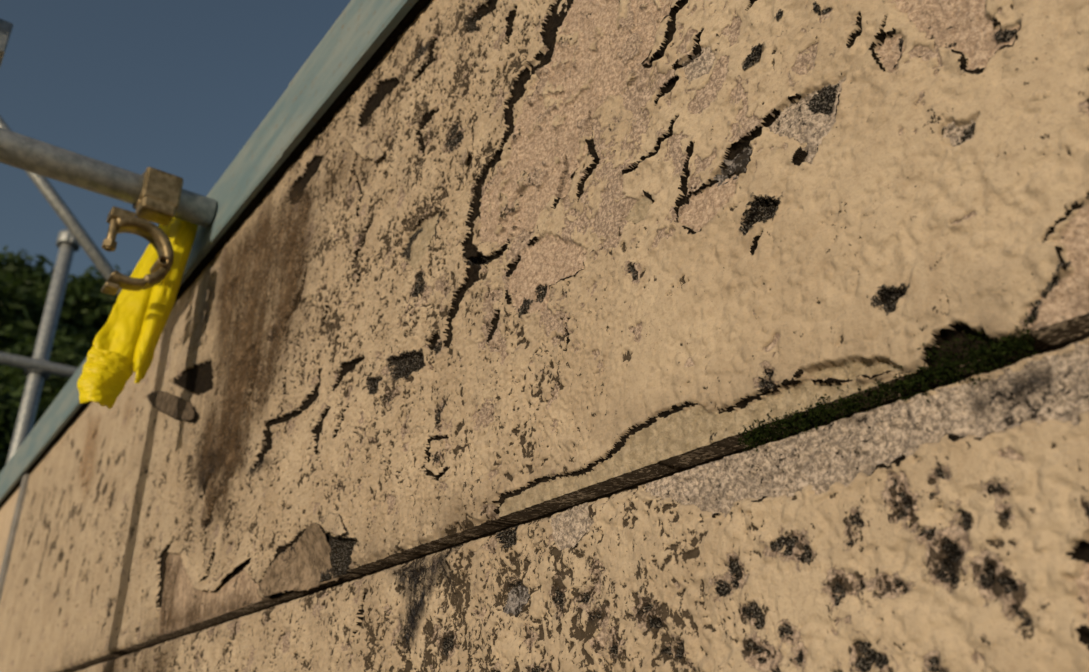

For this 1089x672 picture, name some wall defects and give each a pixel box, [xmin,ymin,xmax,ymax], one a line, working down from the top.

crack [357,37,438,127]
crack [443,0,574,348]
crack [551,0,704,223]
crack [719,108,780,180]
spalling [738,193,782,255]
peeling [769,77,846,166]
peeling [1023,193,1089,334]
leakage [196,199,310,520]
crack [243,348,365,470]
peeling [492,360,900,517]
spalling [645,342,1089,520]
peeling [158,512,357,636]